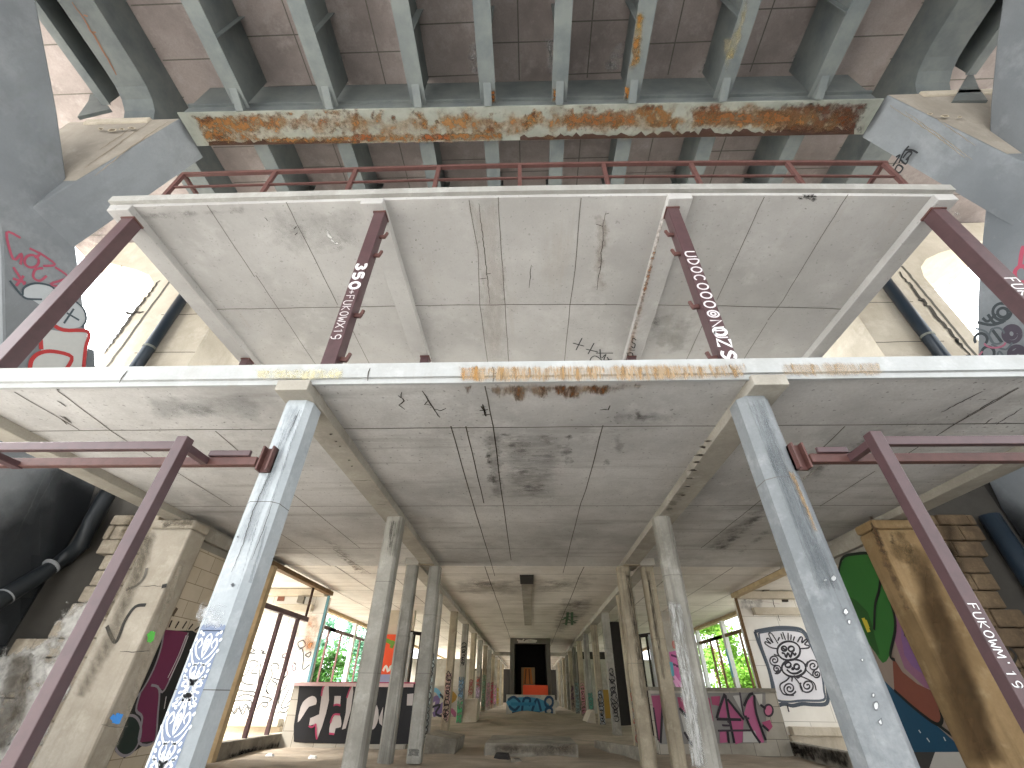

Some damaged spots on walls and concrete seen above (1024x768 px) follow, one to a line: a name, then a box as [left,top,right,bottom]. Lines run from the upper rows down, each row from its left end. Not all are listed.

corrosion [631,14,644,66]
corrosion [194,103,866,146]
crack [596,213,609,287]
corrosion [462,247,743,400]
crack [399,391,446,417]